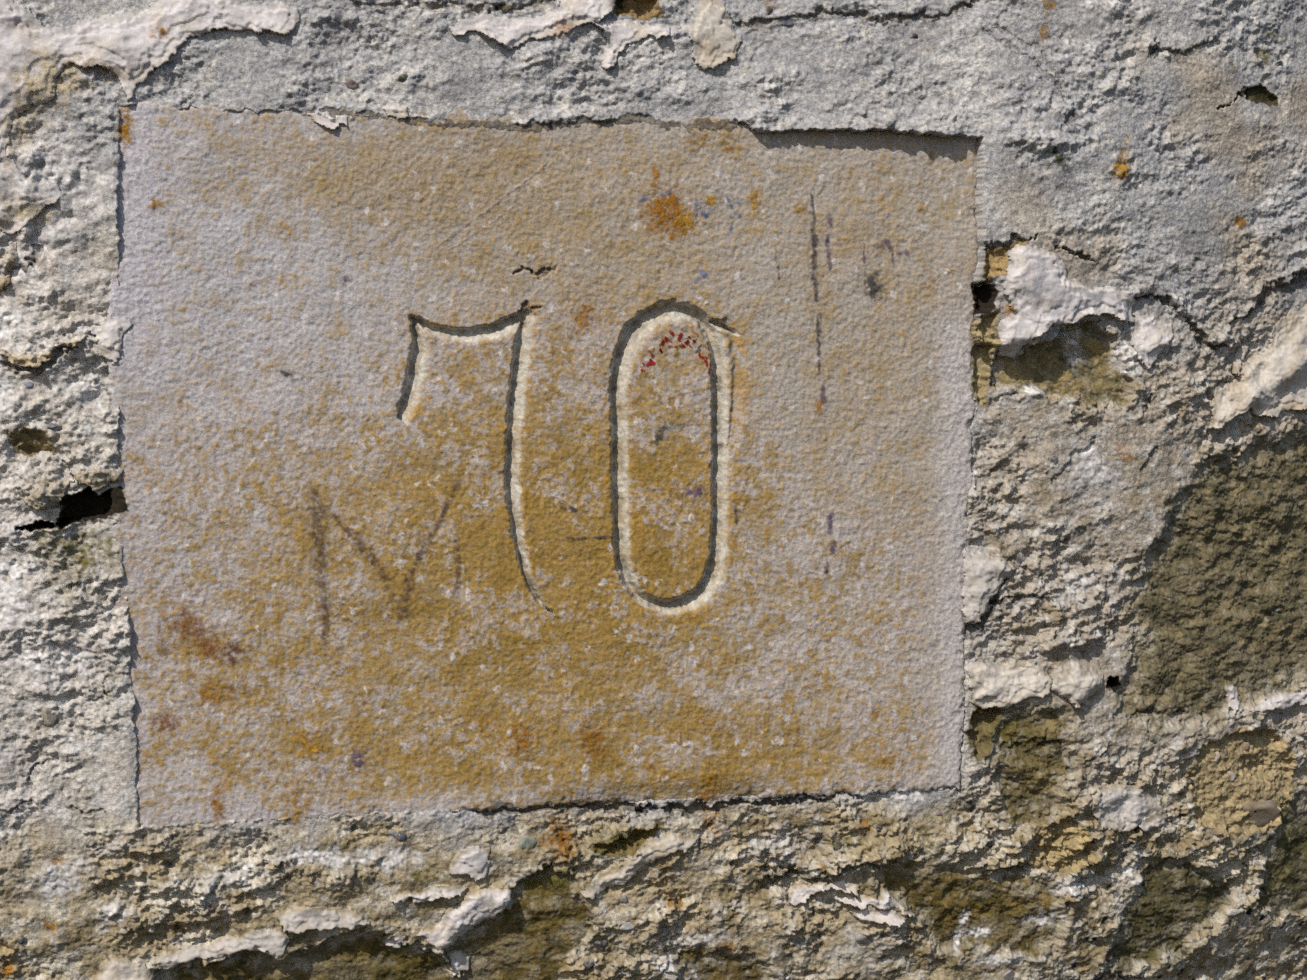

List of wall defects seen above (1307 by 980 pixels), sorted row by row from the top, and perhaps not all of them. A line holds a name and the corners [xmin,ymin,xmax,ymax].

peeling [449,0,670,69]
peeling [688,0,742,70]
peeling [0,0,300,234]
peeling [970,240,1174,410]
peeling [1208,304,1307,429]
flaking render [1116,431,1307,924]
flaking render [787,652,1168,960]
spalling [0,939,17,961]
flaking render [89,821,699,980]
flaking render [670,943,773,980]
flaking render [1105,857,1240,974]